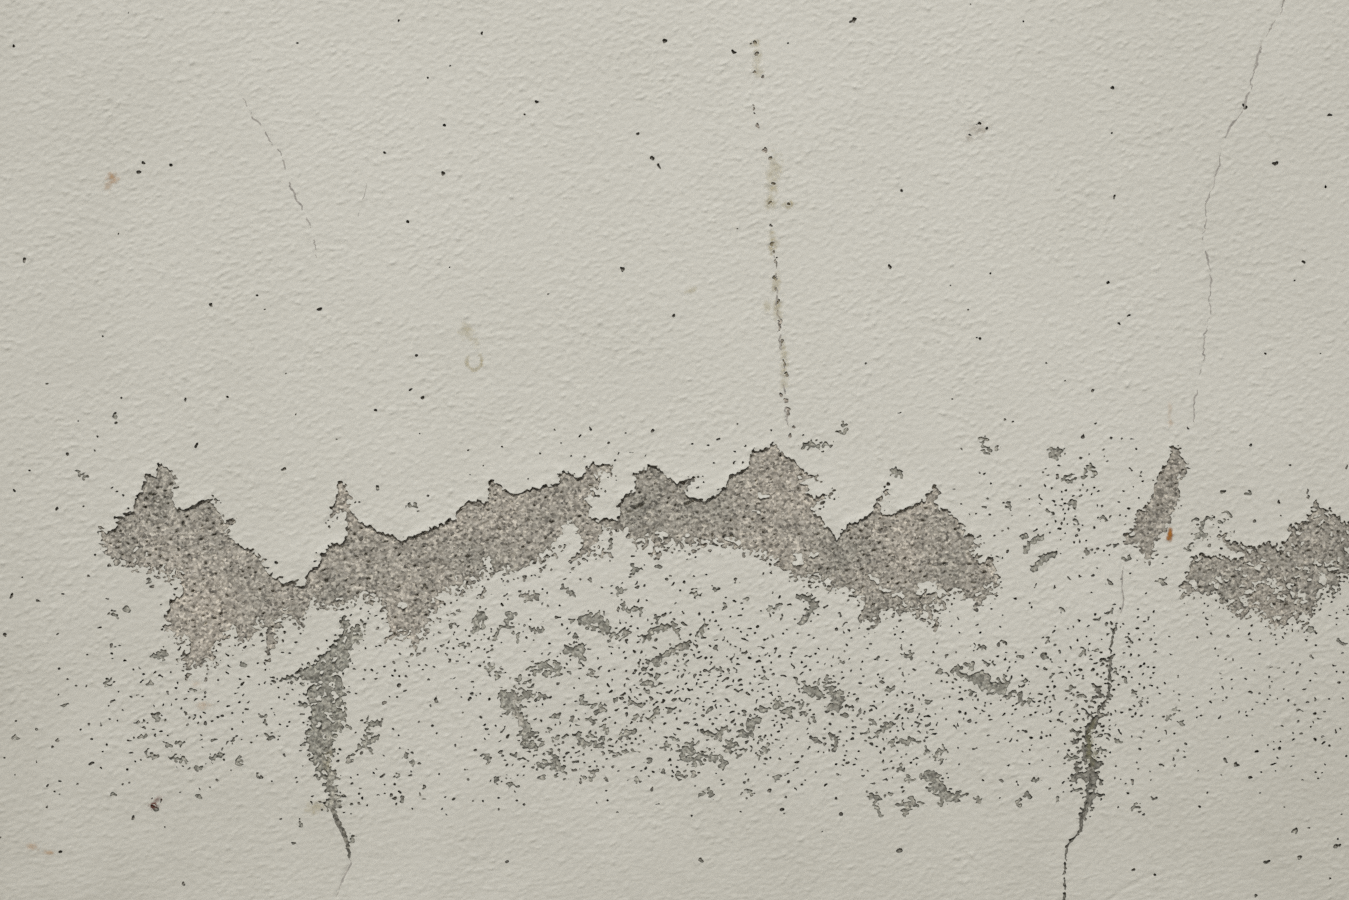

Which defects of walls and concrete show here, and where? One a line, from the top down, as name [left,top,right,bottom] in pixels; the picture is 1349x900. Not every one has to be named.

crack [750,40,796,438]
crack [1193,0,1285,422]
peeling [97,421,1003,817]
peeling [1046,447,1063,461]
peeling [1045,462,1098,525]
crack [1062,567,1124,900]
peeling [1112,445,1349,640]